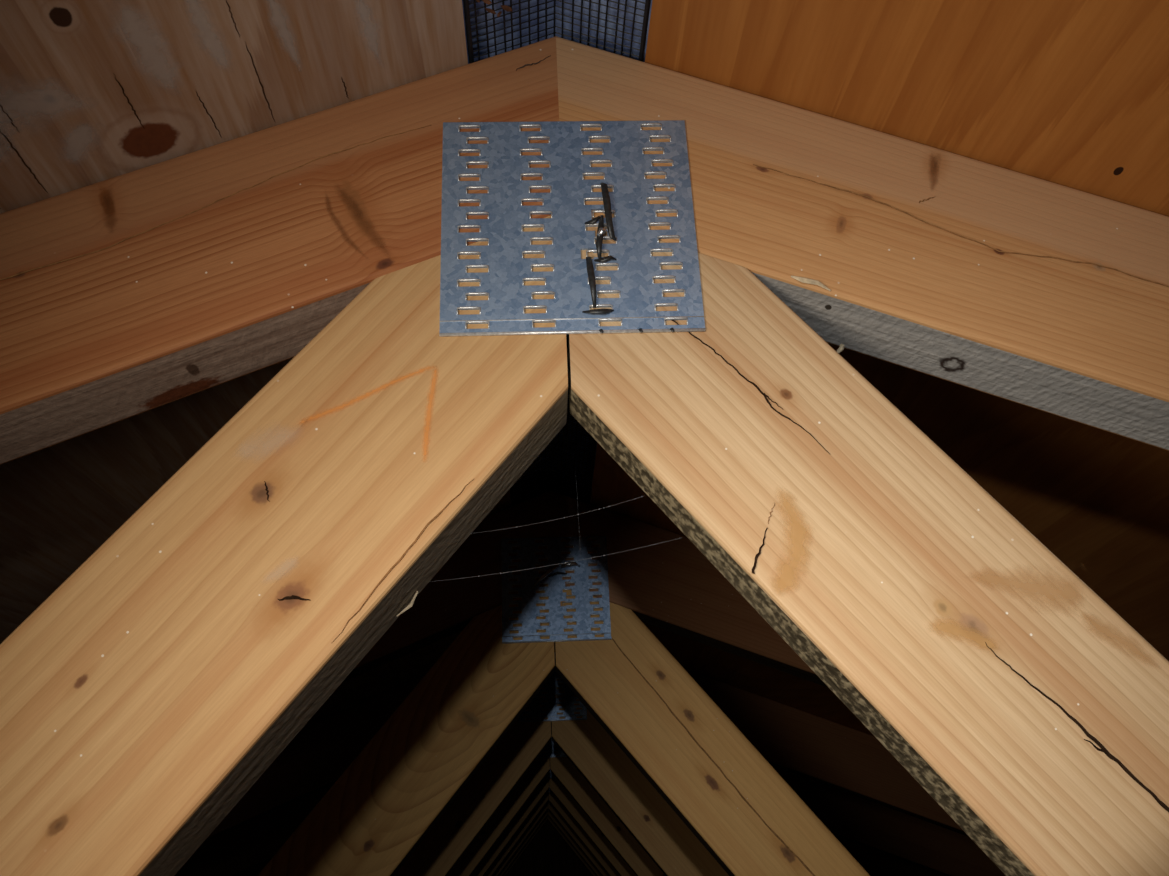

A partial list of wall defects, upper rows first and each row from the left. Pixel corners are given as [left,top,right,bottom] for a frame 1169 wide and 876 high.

crack [753,164,1169,287]
crack [672,320,830,454]
crack [752,504,775,574]
crack [985,642,1169,812]